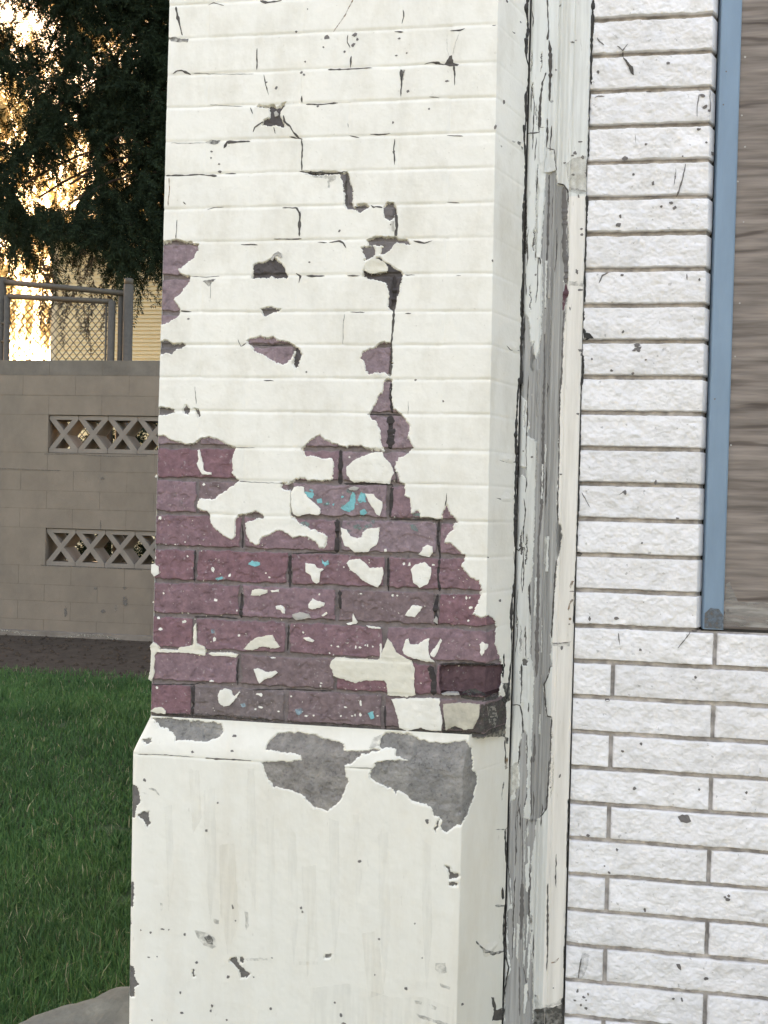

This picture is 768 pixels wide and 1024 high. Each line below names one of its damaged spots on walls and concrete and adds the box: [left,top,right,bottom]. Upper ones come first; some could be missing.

peeling [535,127,586,331]
peeling [161,240,198,325]
peeling [252,259,288,279]
crack [296,273,358,281]
peeling [361,237,410,311]
peeling [249,336,307,373]
crack [390,306,411,375]
peeling [523,443,547,499]
peeling [148,340,507,832]
peeling [520,536,550,735]
spalling [227,957,254,978]
peeling [513,915,536,1014]